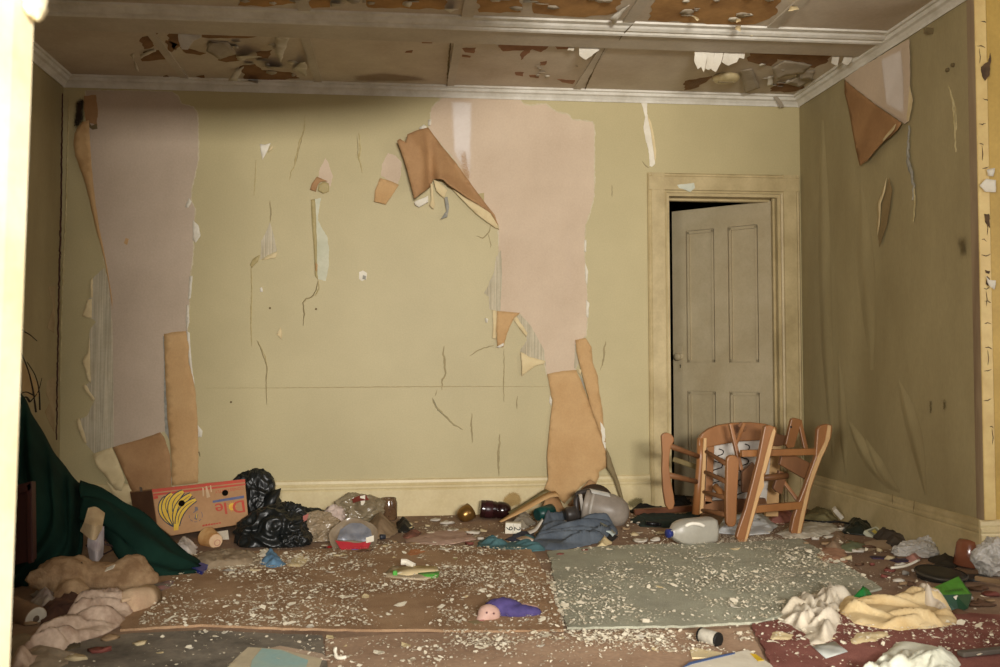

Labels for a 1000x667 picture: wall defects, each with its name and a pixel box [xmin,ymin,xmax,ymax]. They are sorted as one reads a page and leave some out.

peeling [238,0,459,13]
peeling [477,0,629,24]
peeling [648,0,799,36]
peeling [130,33,307,84]
peeling [683,39,913,141]
peeling [641,103,656,168]
peeling [310,158,333,193]
peeling [374,153,402,204]
peeling [877,178,887,236]
flaking render [414,98,594,376]
flaking render [86,91,201,447]
crack [247,341,548,442]